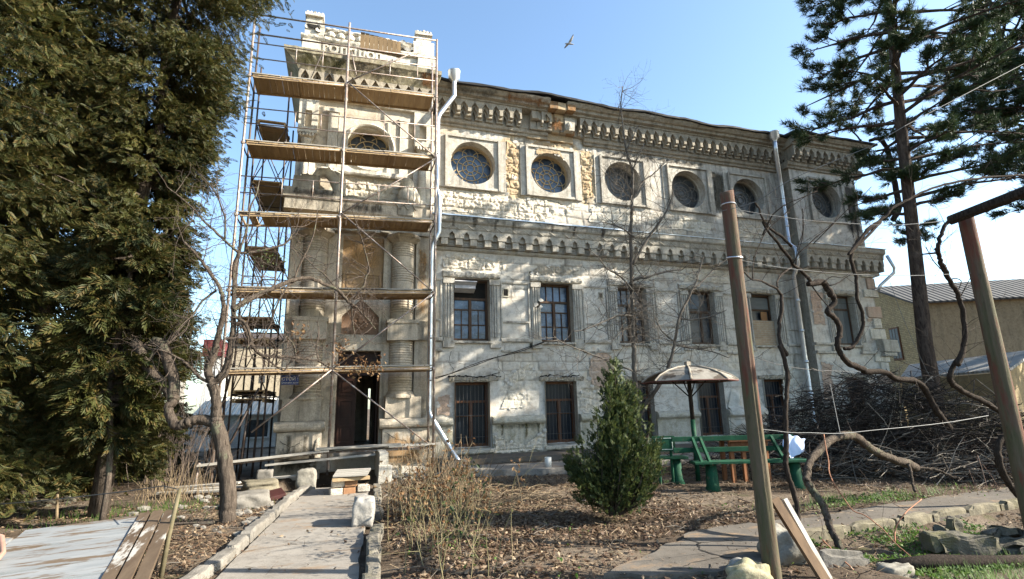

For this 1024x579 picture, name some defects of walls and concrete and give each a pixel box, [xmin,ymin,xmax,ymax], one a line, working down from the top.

spalling [440,140,556,221]
spalling [532,140,640,227]